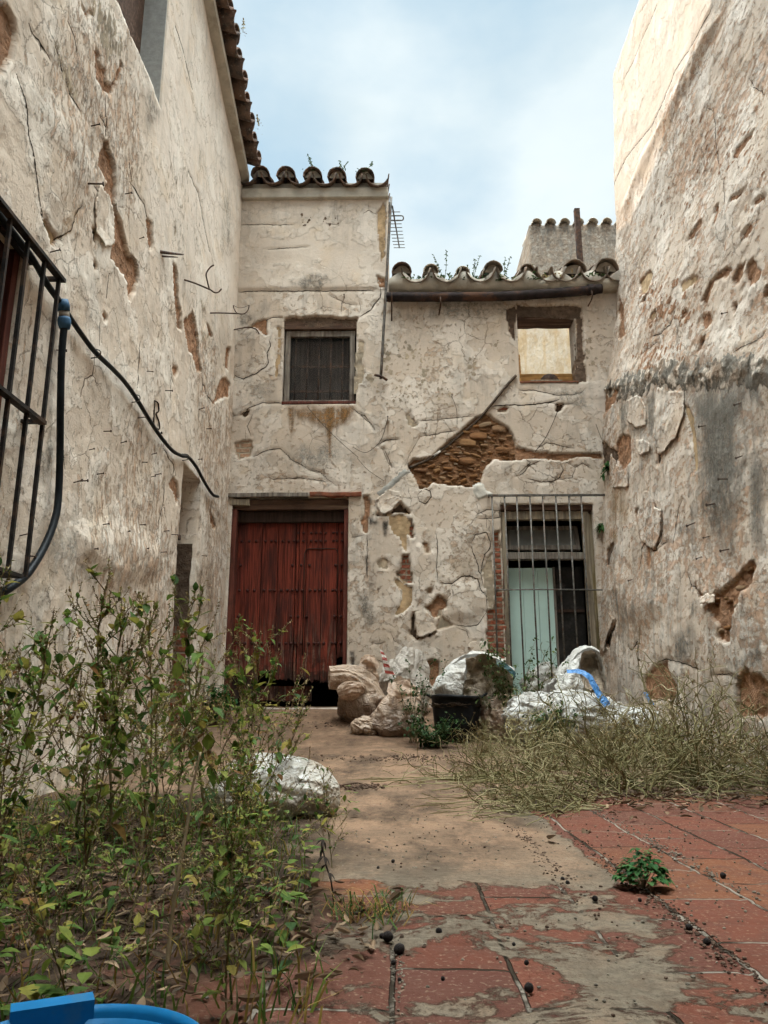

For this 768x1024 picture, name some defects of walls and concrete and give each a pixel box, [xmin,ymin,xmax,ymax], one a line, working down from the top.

crack [16,74,98,241]
flaking render [92,145,136,294]
flaking render [173,266,211,372]
crack [235,317,281,380]
crack [241,402,330,482]
crack [244,288,381,317]
crack [353,409,467,468]
crack [491,390,584,407]
flaking render [408,387,698,489]
flaking render [361,490,452,640]
flaking render [443,532,507,658]
flaking render [699,564,757,642]